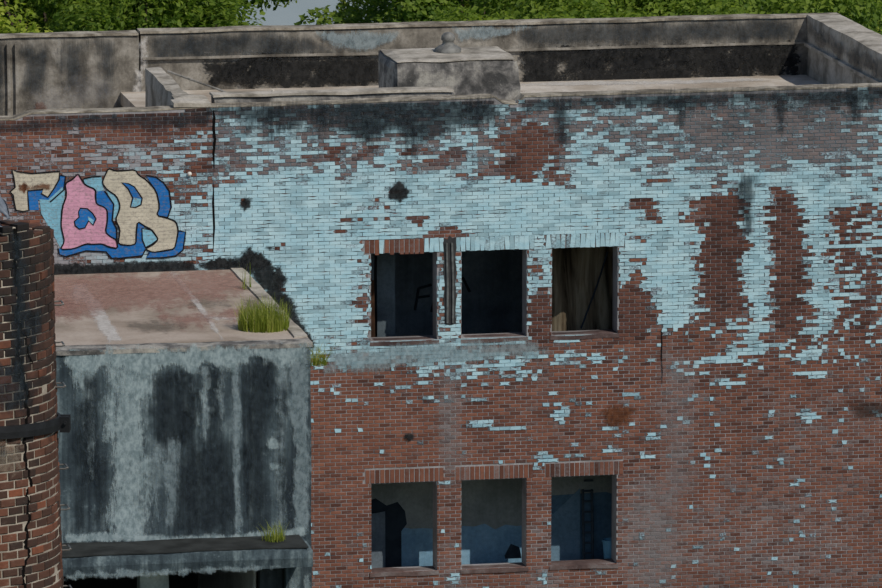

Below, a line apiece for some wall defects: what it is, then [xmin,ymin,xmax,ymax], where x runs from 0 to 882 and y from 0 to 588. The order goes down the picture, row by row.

damp [134,32,397,92]
crack [210,110,218,250]
spalling [389,181,409,202]
peeling [489,111,565,182]
peeling [630,198,657,220]
peeling [695,196,748,326]
peeling [765,187,812,335]
peeling [829,203,882,333]
crack [12,228,33,588]
damp [53,247,314,543]
peeling [670,341,764,389]
peeling [785,345,837,379]